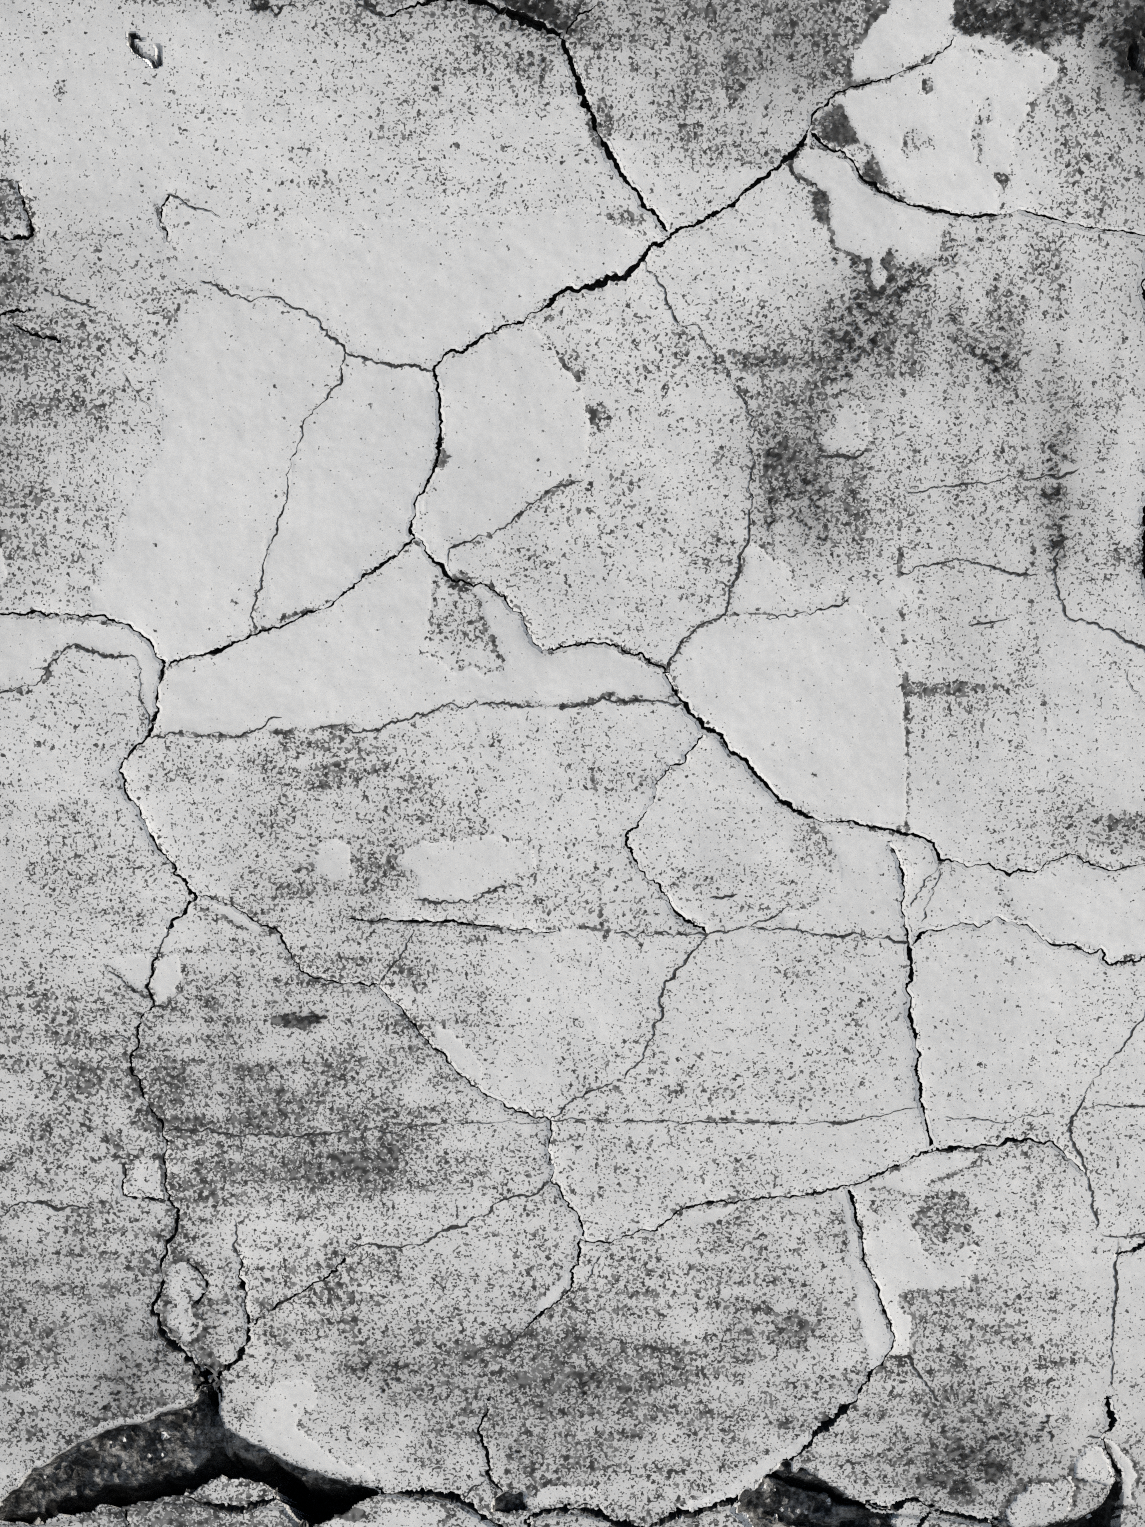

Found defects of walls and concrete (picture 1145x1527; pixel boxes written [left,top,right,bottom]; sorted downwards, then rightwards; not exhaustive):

crack [0,179,38,244]
crack [156,194,221,242]
crack [0,288,96,344]
crack [166,0,1145,672]
crack [899,548,1145,703]
crack [0,606,1145,1481]
flaking render [0,1380,448,1527]
crack [183,1489,306,1527]
crack [378,1400,741,1527]
flaking render [684,1431,899,1527]
crack [865,1494,993,1527]
flaking render [988,1440,1137,1527]